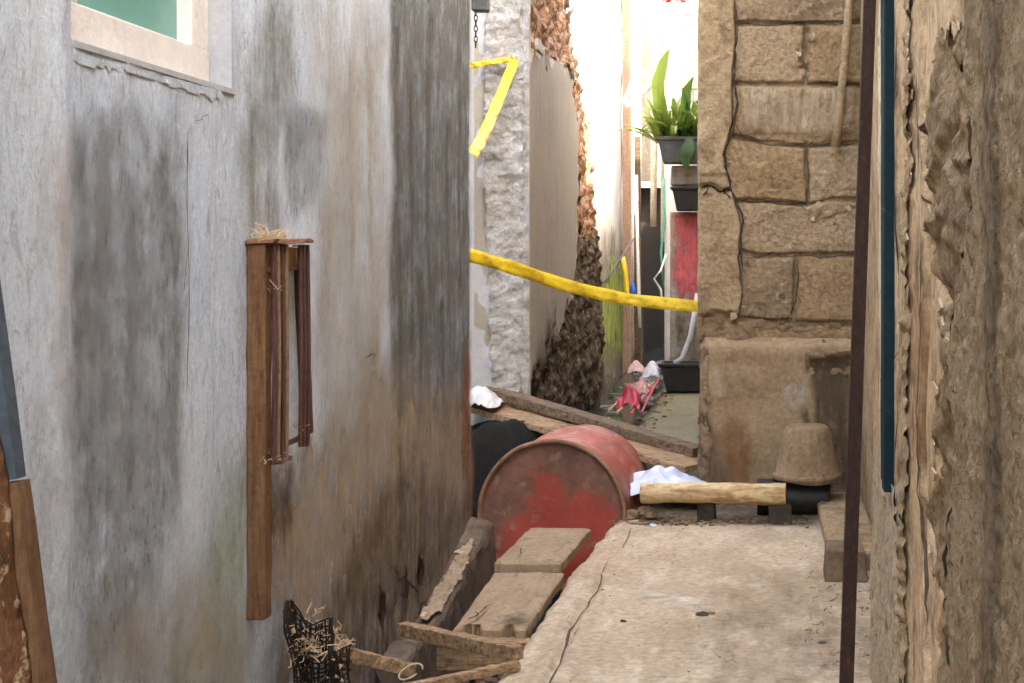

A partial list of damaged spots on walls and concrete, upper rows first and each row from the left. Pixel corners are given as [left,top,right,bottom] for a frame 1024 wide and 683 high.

water stain [74,118,181,683]
peeling [74,54,222,101]
water stain [269,0,471,683]
flaking render [482,0,597,392]
crack [699,11,855,319]
flaking render [869,0,972,683]
crack [549,529,634,683]